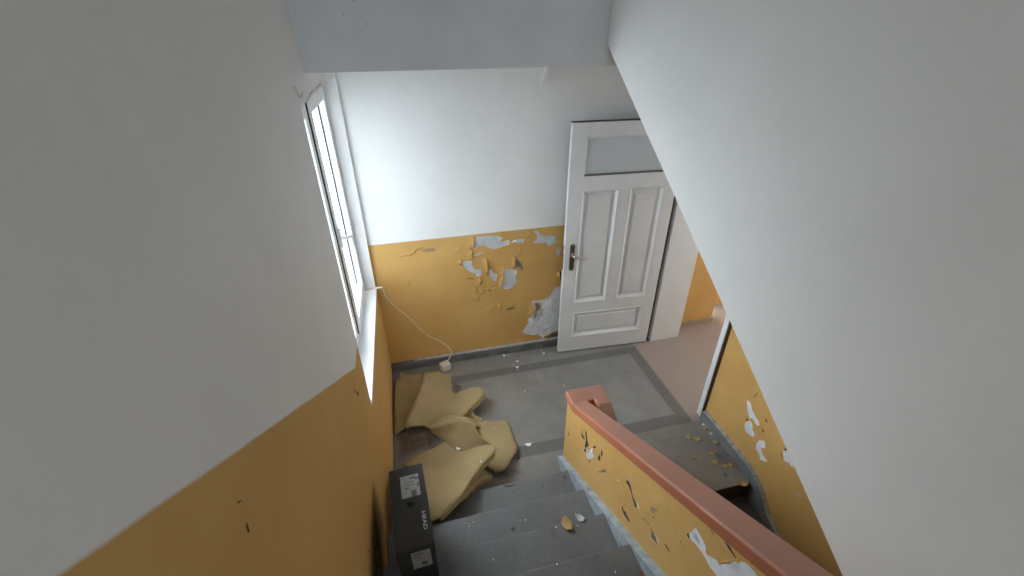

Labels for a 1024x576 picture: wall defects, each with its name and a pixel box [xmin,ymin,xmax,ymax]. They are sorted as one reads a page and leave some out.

peeling [455,229,562,292]
peeling [505,285,561,339]
peeling [744,400,769,465]
peeling [583,448,607,475]
peeling [689,520,758,576]